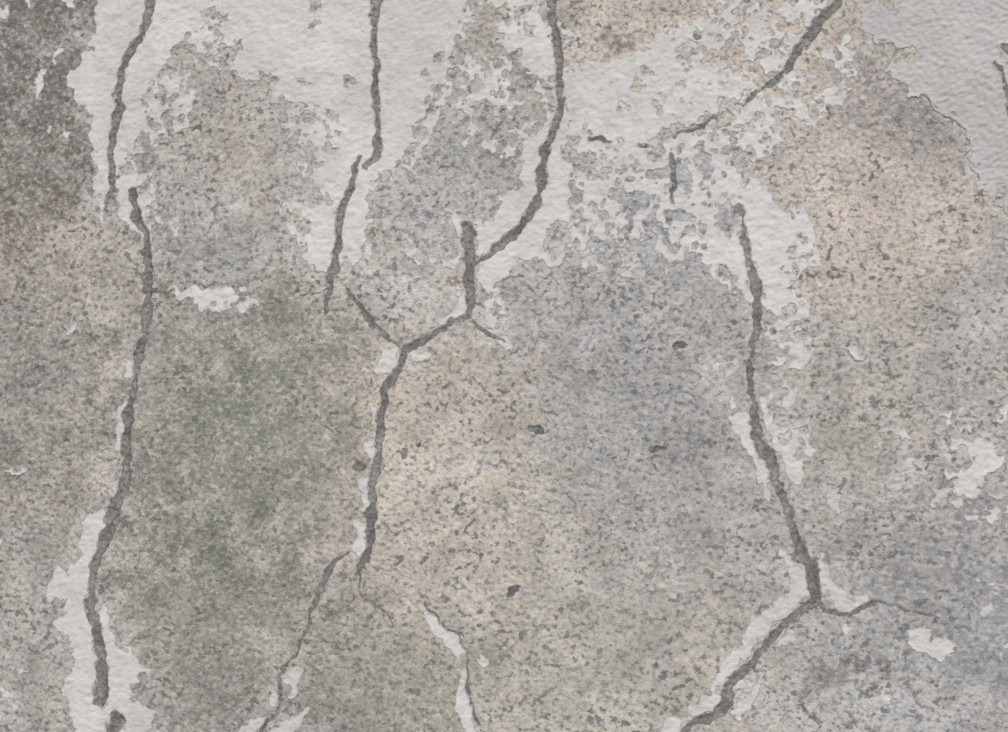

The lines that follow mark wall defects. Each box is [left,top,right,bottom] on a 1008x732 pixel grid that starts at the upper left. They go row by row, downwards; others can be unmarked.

crack [669,0,842,195]
peeling [66,0,1008,502]
peeling [35,509,161,732]
crack [84,0,174,732]
peeling [351,441,375,558]
crack [259,0,578,732]
crack [681,205,936,732]
peeling [907,626,957,663]
peeling [929,403,1008,530]
peeling [969,552,1008,630]